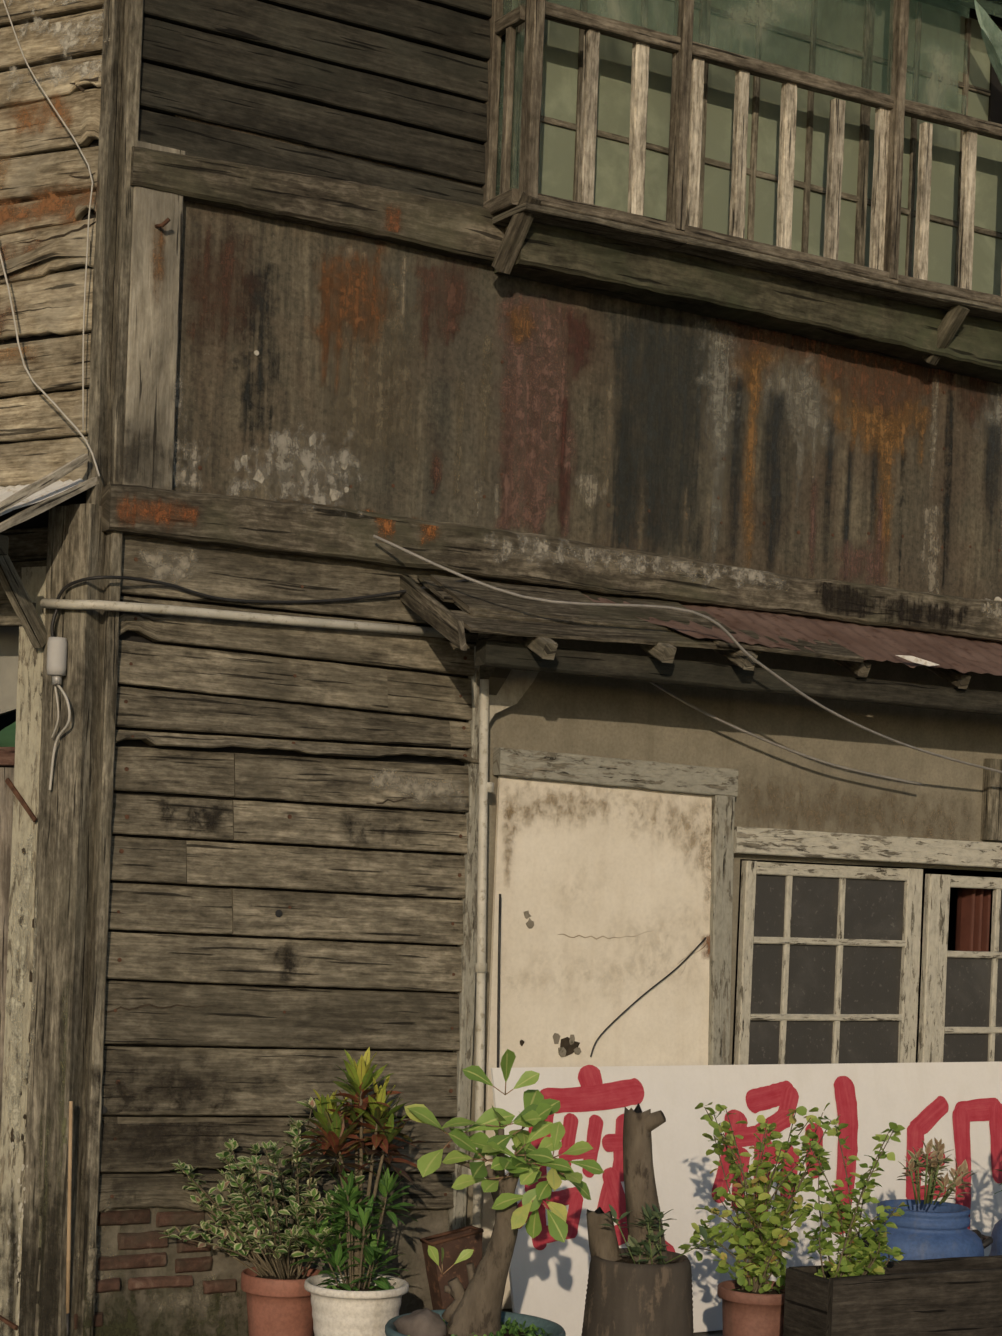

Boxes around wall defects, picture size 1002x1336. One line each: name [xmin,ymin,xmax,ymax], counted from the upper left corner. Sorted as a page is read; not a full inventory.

peeling [230,427,361,508]
water stain [603,305,744,558]
rust [732,353,783,555]
water stain [764,360,967,628]
rust [825,377,929,569]
water stain [0,1008,68,1336]